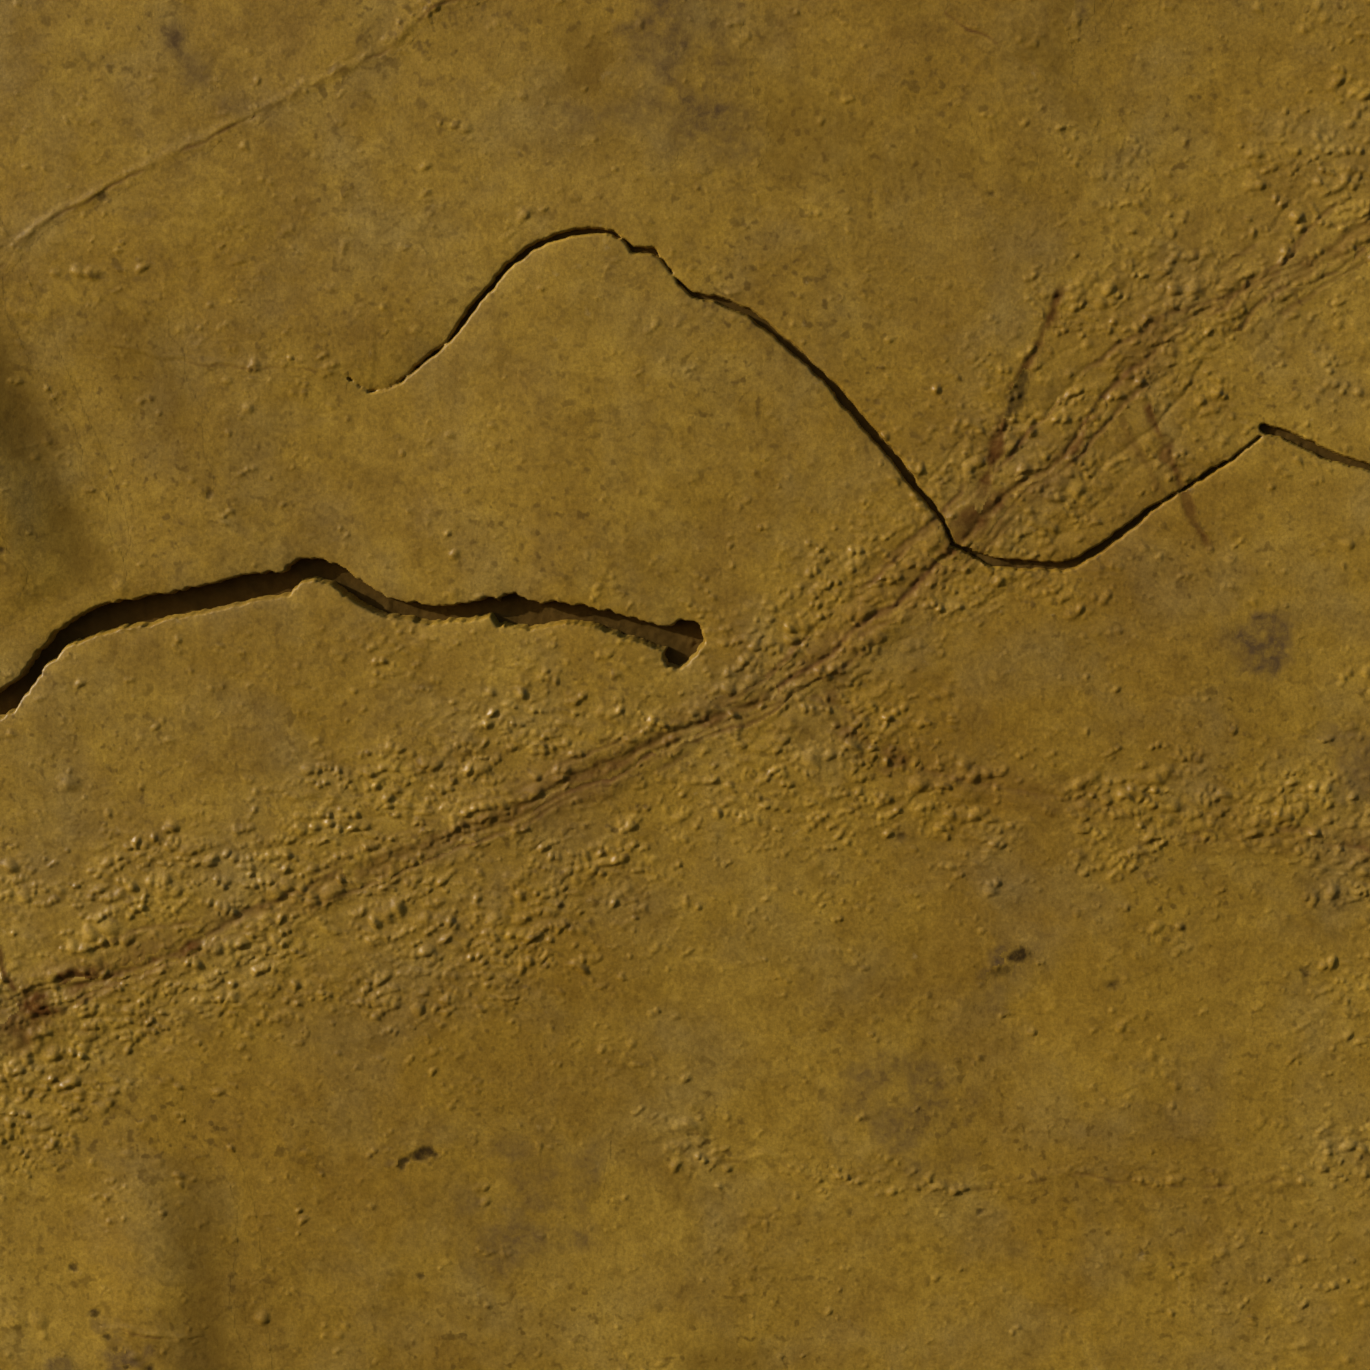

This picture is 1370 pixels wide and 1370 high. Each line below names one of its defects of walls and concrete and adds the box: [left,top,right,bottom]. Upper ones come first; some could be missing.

crack [182,229,1370,570]
crack [0,558,704,715]